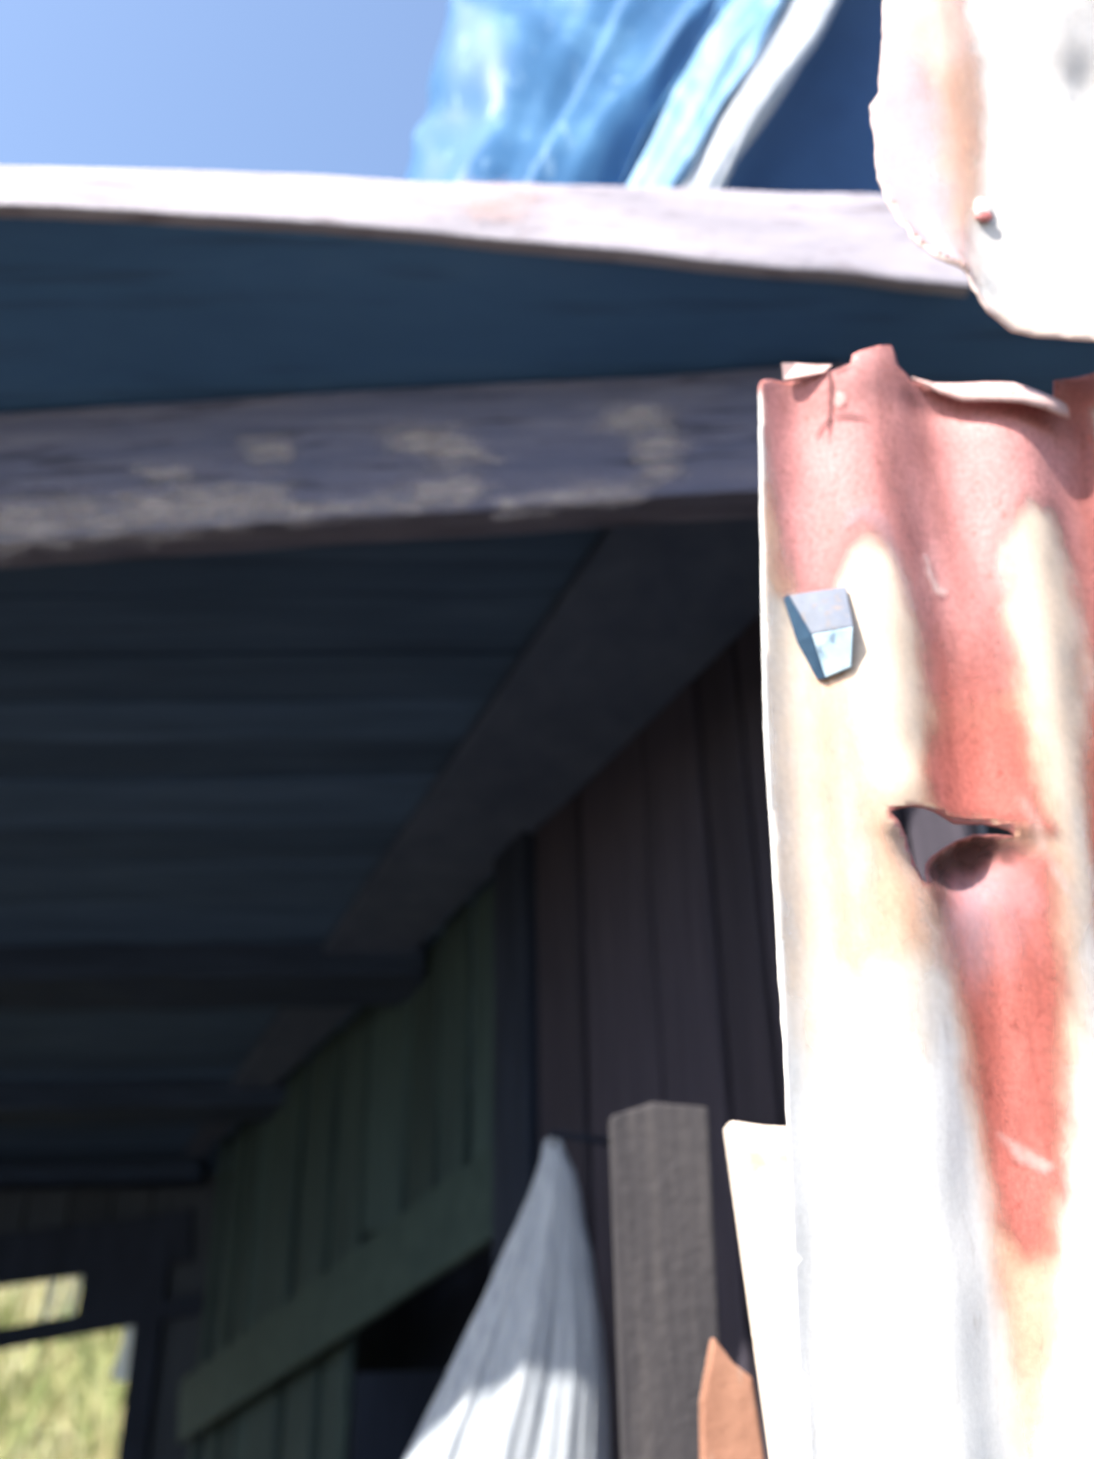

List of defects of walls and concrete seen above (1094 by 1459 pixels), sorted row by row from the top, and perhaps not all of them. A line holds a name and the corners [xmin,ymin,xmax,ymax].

corrosion [875,0,978,275]
crack [817,363,866,435]
corrosion [762,345,1094,1429]